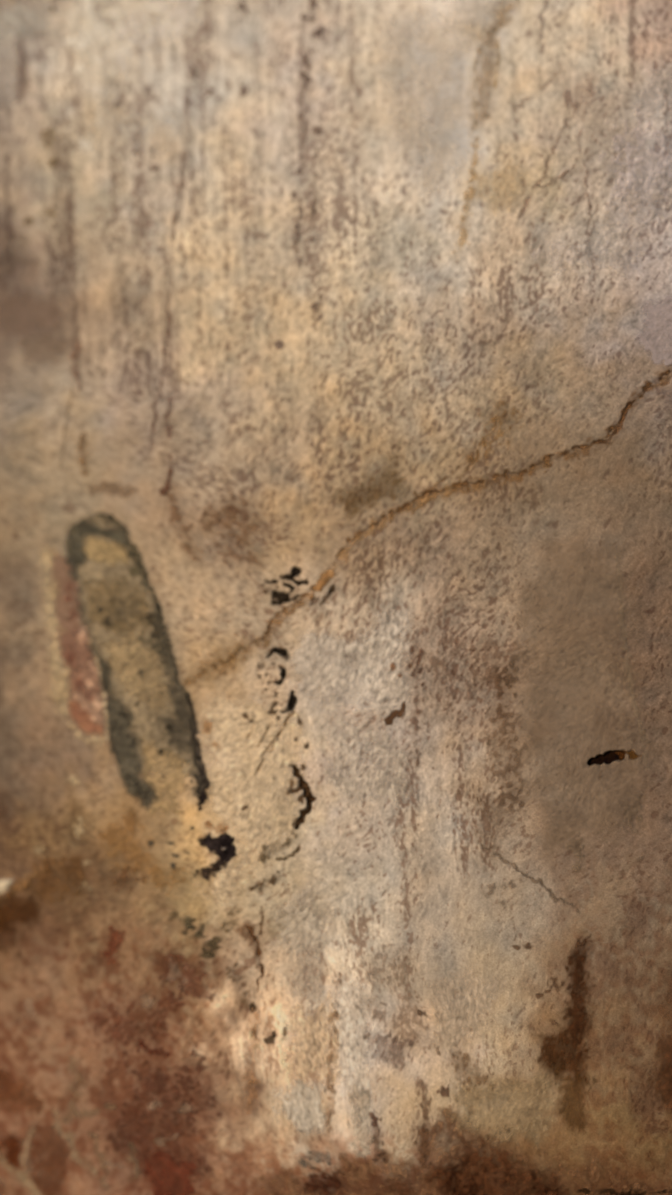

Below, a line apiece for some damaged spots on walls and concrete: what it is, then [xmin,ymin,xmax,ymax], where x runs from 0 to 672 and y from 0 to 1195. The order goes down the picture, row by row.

crack [264,371,670,640]
spalling [261,567,335,606]
spalling [268,648,309,749]
spalling [588,750,638,765]